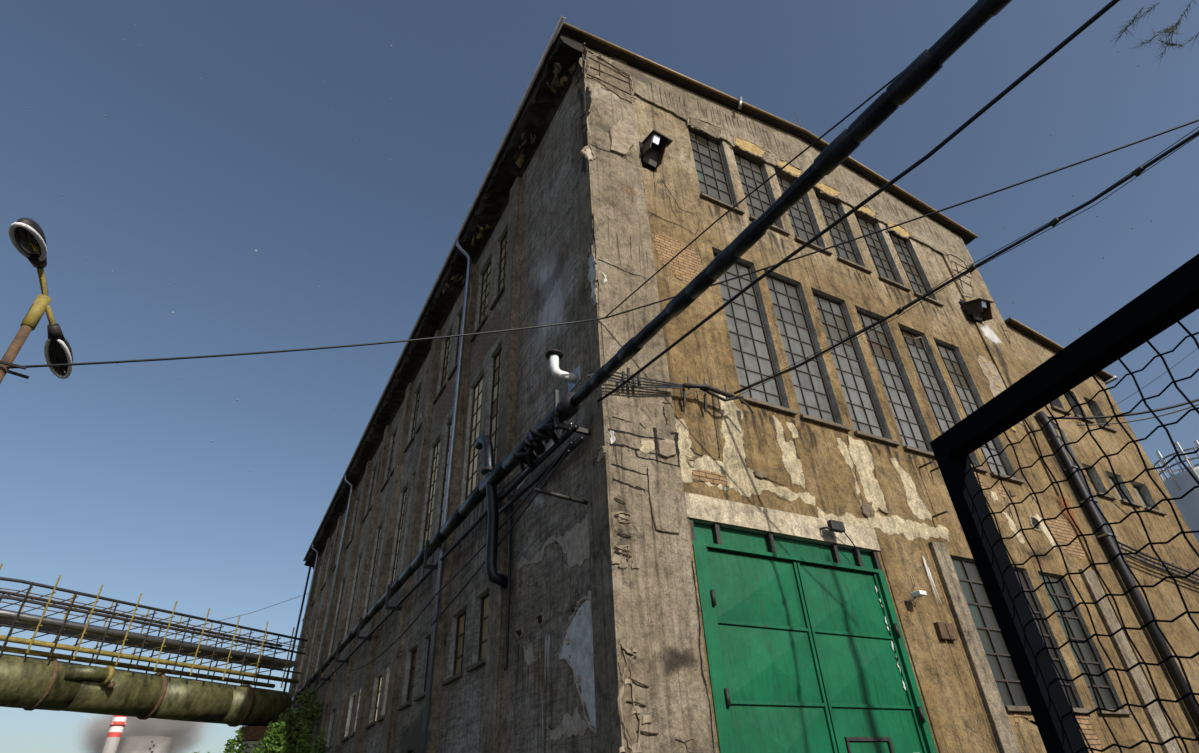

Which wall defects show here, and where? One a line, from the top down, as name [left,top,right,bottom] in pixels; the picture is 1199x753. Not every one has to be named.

flaking render [640,439,655,454]
flaking render [674,389,949,542]
flaking render [548,591,596,741]
spalling [617,644,659,753]